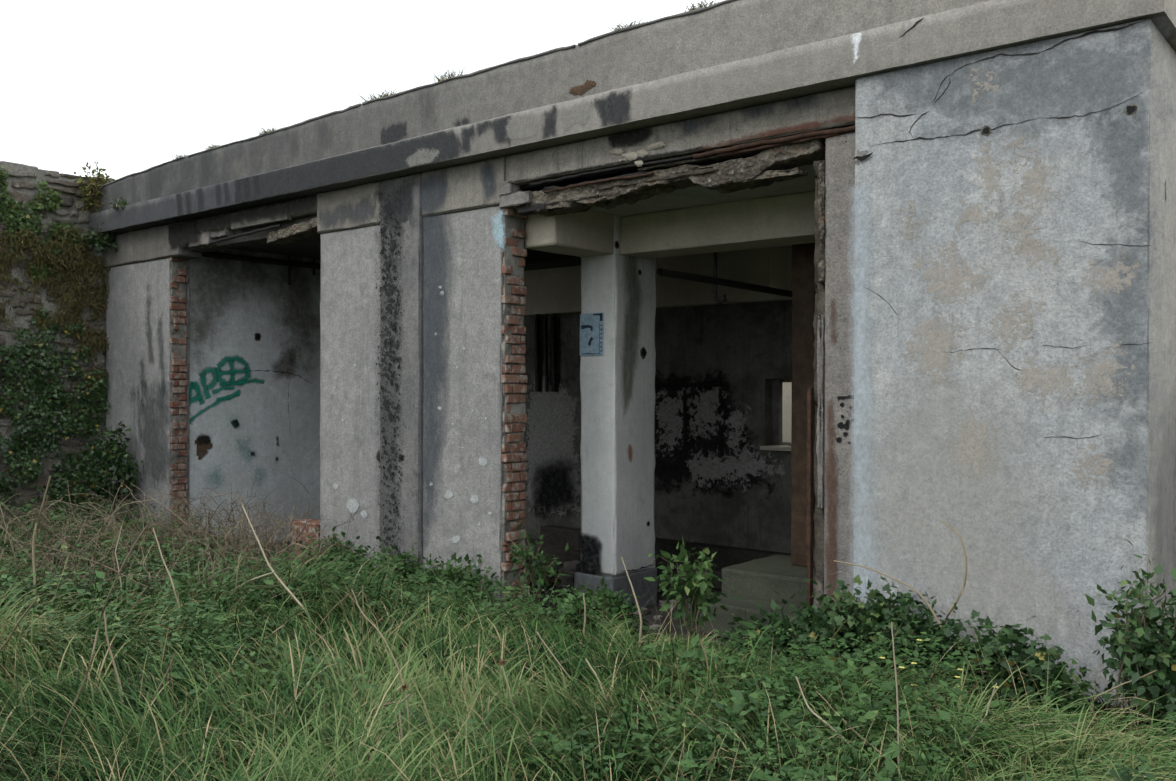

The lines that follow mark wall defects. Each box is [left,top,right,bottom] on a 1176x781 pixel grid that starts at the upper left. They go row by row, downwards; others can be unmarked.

damp [381,123,406,144]
spalling [853,149,873,165]
crack [856,18,1152,146]
damp [133,288,172,487]
flaking render [169,207,319,527]
spalling [498,114,855,624]
crack [946,348,1023,371]